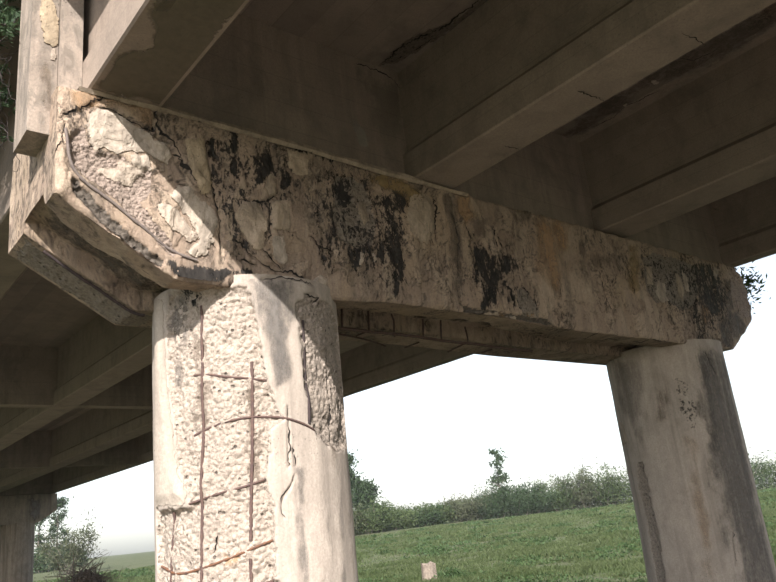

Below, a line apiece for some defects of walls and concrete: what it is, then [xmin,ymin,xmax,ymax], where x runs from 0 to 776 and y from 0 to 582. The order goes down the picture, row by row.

peeling [40,0,59,61]
crack [357,1,478,88]
spalling [64,108,218,266]
crack [54,97,319,303]
water stain [168,132,300,282]
water stain [256,281,293,384]
water stain [313,157,408,299]
water stain [443,195,528,311]
spalling [459,303,551,325]
spalling [16,239,533,582]
crack [280,405,296,517]
water stain [698,352,775,582]